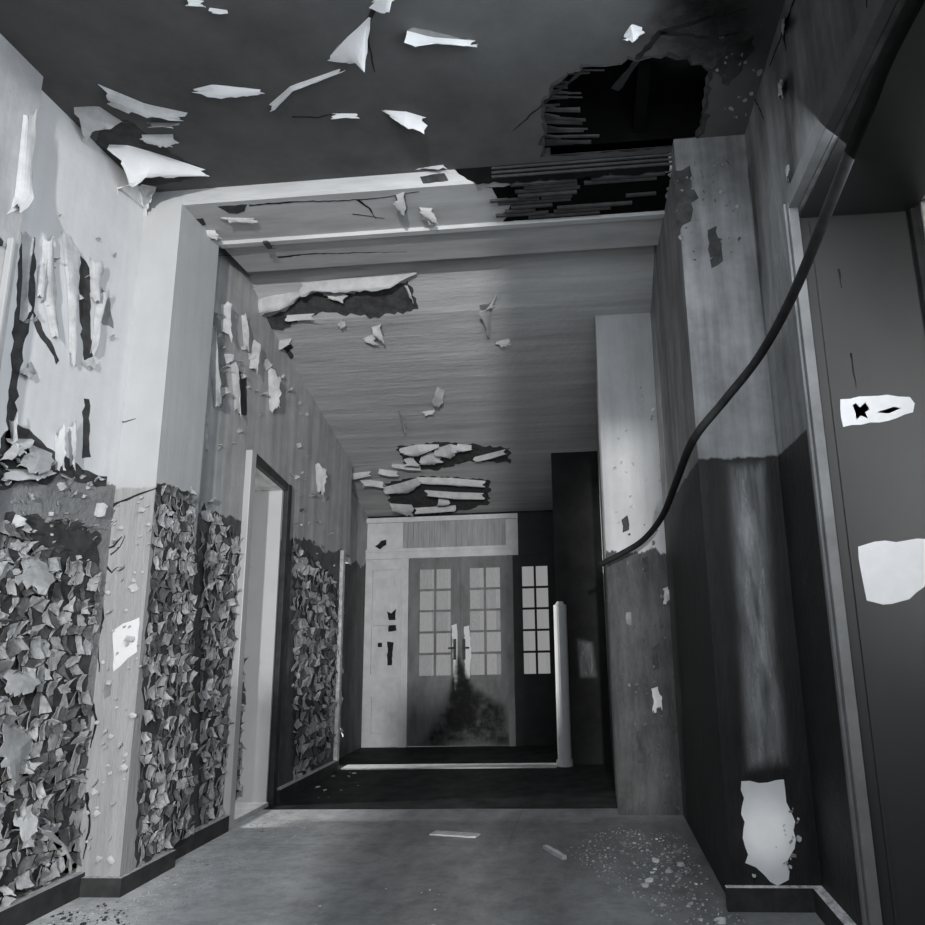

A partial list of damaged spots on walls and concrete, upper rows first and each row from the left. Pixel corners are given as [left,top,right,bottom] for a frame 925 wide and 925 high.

peeling [0,231,252,908]